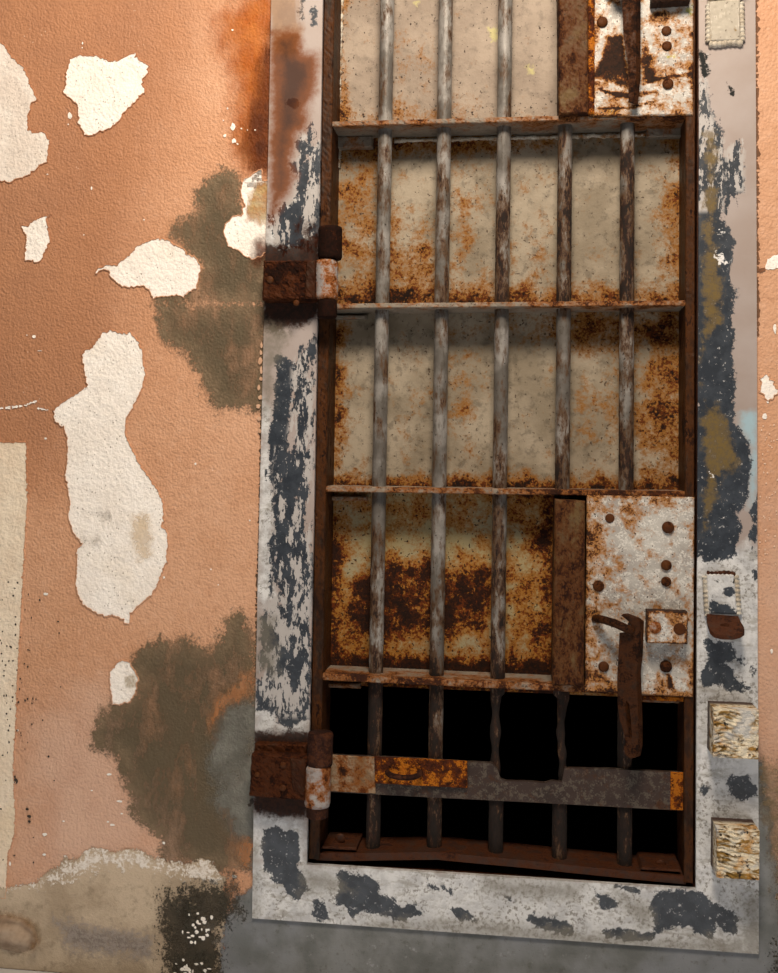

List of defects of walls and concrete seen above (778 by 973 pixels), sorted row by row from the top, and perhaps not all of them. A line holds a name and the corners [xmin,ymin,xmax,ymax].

peeling [0,41,51,184]
peeling [62,42,150,137]
peeling [95,237,202,300]
water stain [150,164,266,416]
corrosion [224,0,271,171]
crack [755,0,778,337]
peeling [52,329,169,625]
water stain [89,608,256,876]